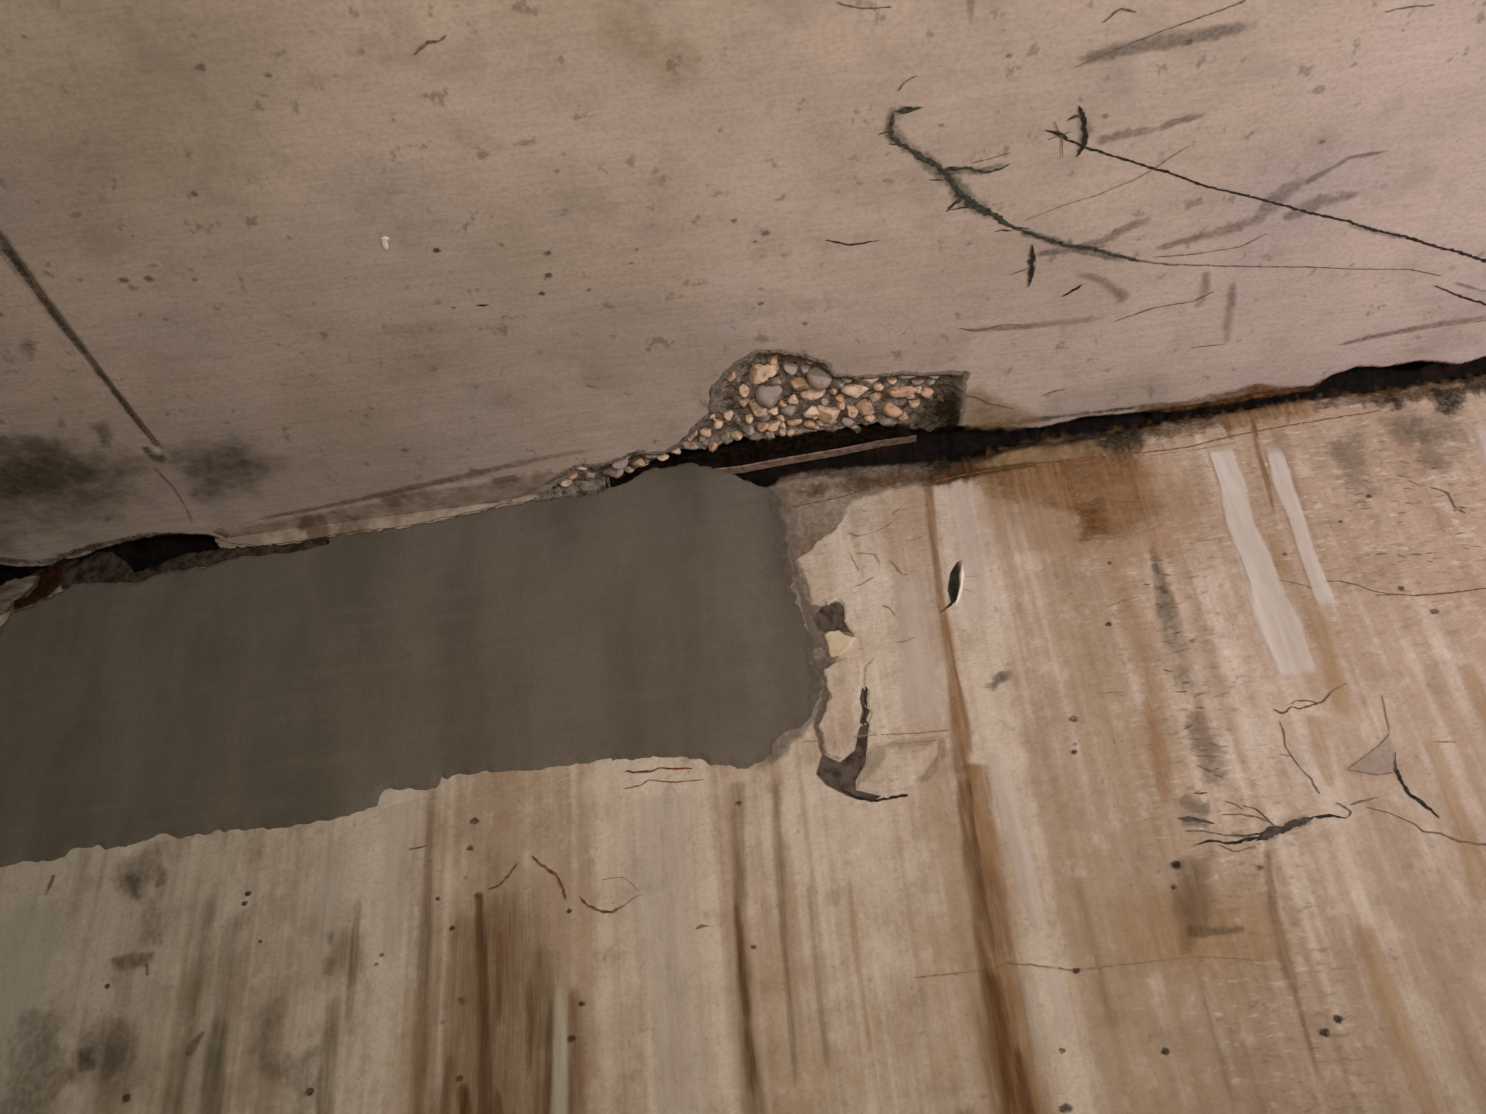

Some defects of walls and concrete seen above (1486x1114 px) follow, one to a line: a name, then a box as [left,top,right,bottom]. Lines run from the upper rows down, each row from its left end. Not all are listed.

crack [1075,0,1246,68]
crack [605,76,1486,508]
spalling [0,562,76,615]
crack [0,503,513,586]
spalling [508,349,971,504]
peeling [769,466,922,800]
corrosion [928,399,1157,639]
corrosion [1141,384,1308,435]
corrosion [1260,457,1274,507]
crack [1178,683,1486,852]
crack [488,856,641,913]
corrosion [950,664,1038,1114]